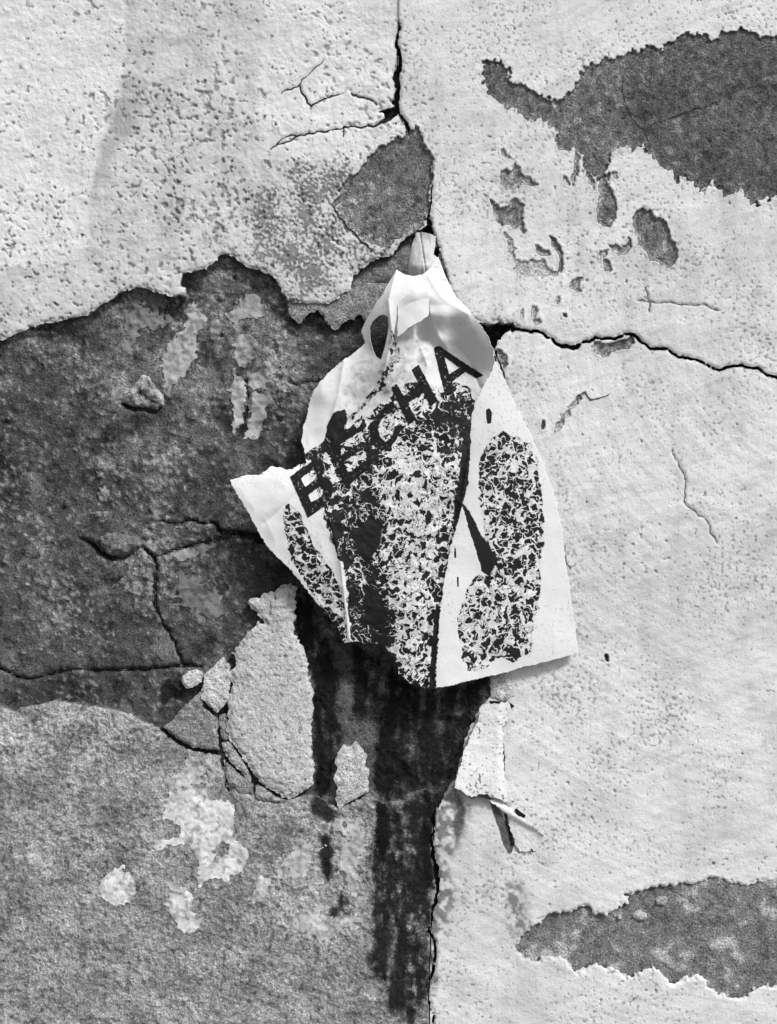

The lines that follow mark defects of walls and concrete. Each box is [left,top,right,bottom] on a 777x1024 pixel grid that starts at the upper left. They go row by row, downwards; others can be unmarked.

crack [270,25,410,150]
flaking render [332,125,434,250]
peeling [490,148,564,278]
peeling [481,26,777,227]
peeling [598,208,678,272]
crack [494,327,777,386]
crack [0,520,265,679]
leakage [294,591,343,880]
leakage [330,893,353,918]
leakage [352,645,486,1024]
crack [427,793,440,1022]
peeling [455,702,544,853]